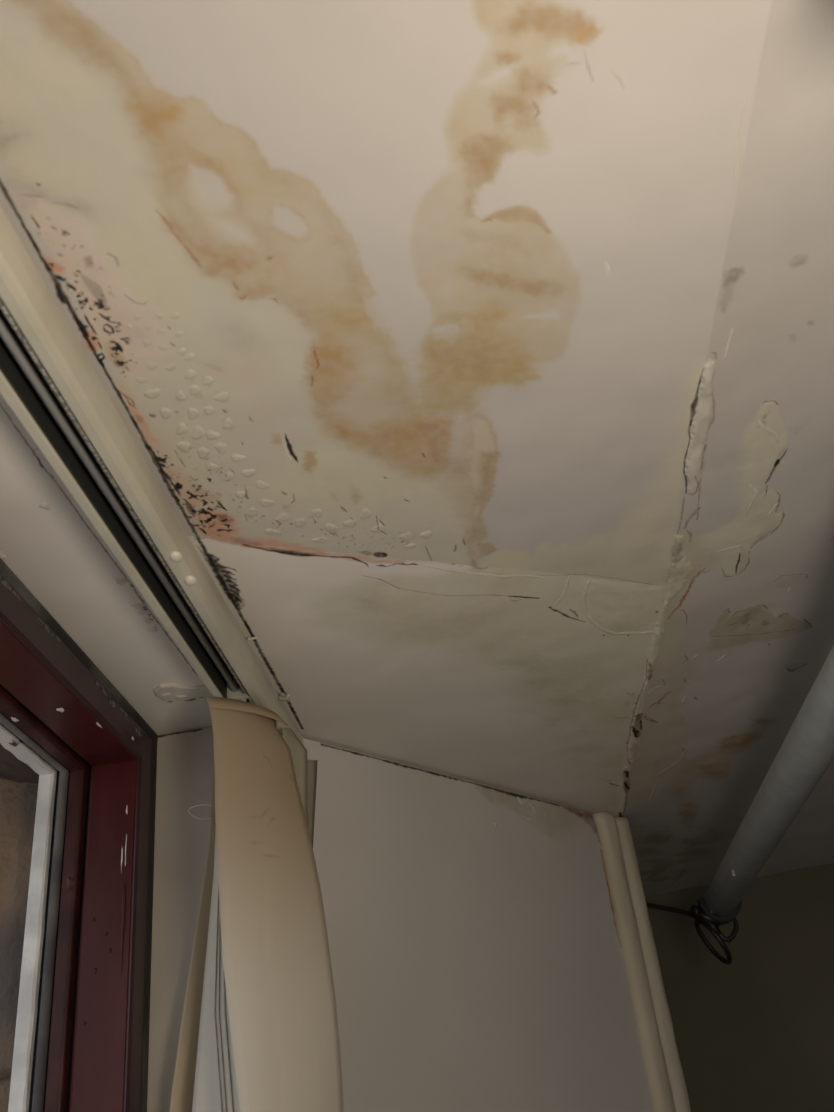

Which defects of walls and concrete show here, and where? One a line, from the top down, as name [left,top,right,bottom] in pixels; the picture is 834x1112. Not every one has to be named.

crack [0,103,629,814]
water stain [0,0,743,897]
peeling [700,603,814,654]